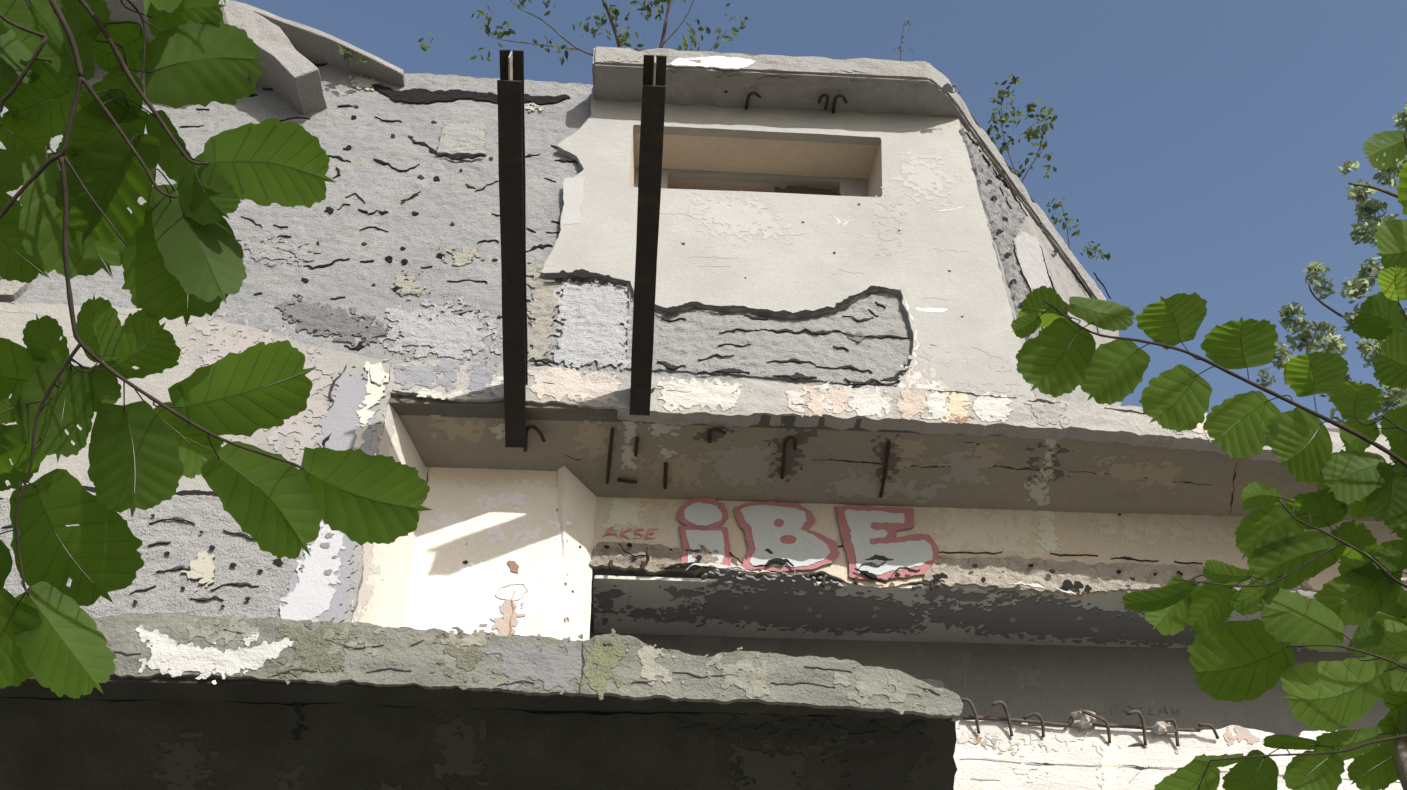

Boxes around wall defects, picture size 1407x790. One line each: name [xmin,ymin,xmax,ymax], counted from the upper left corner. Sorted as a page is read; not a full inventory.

peeling [431,120,493,172]
spalling [561,176,585,225]
spalling [960,128,1059,317]
spalling [526,260,563,366]
spalling [626,288,634,370]
spalling [652,291,919,385]
crack [83,485,95,493]
rust [638,451,711,491]
crack [130,490,259,634]